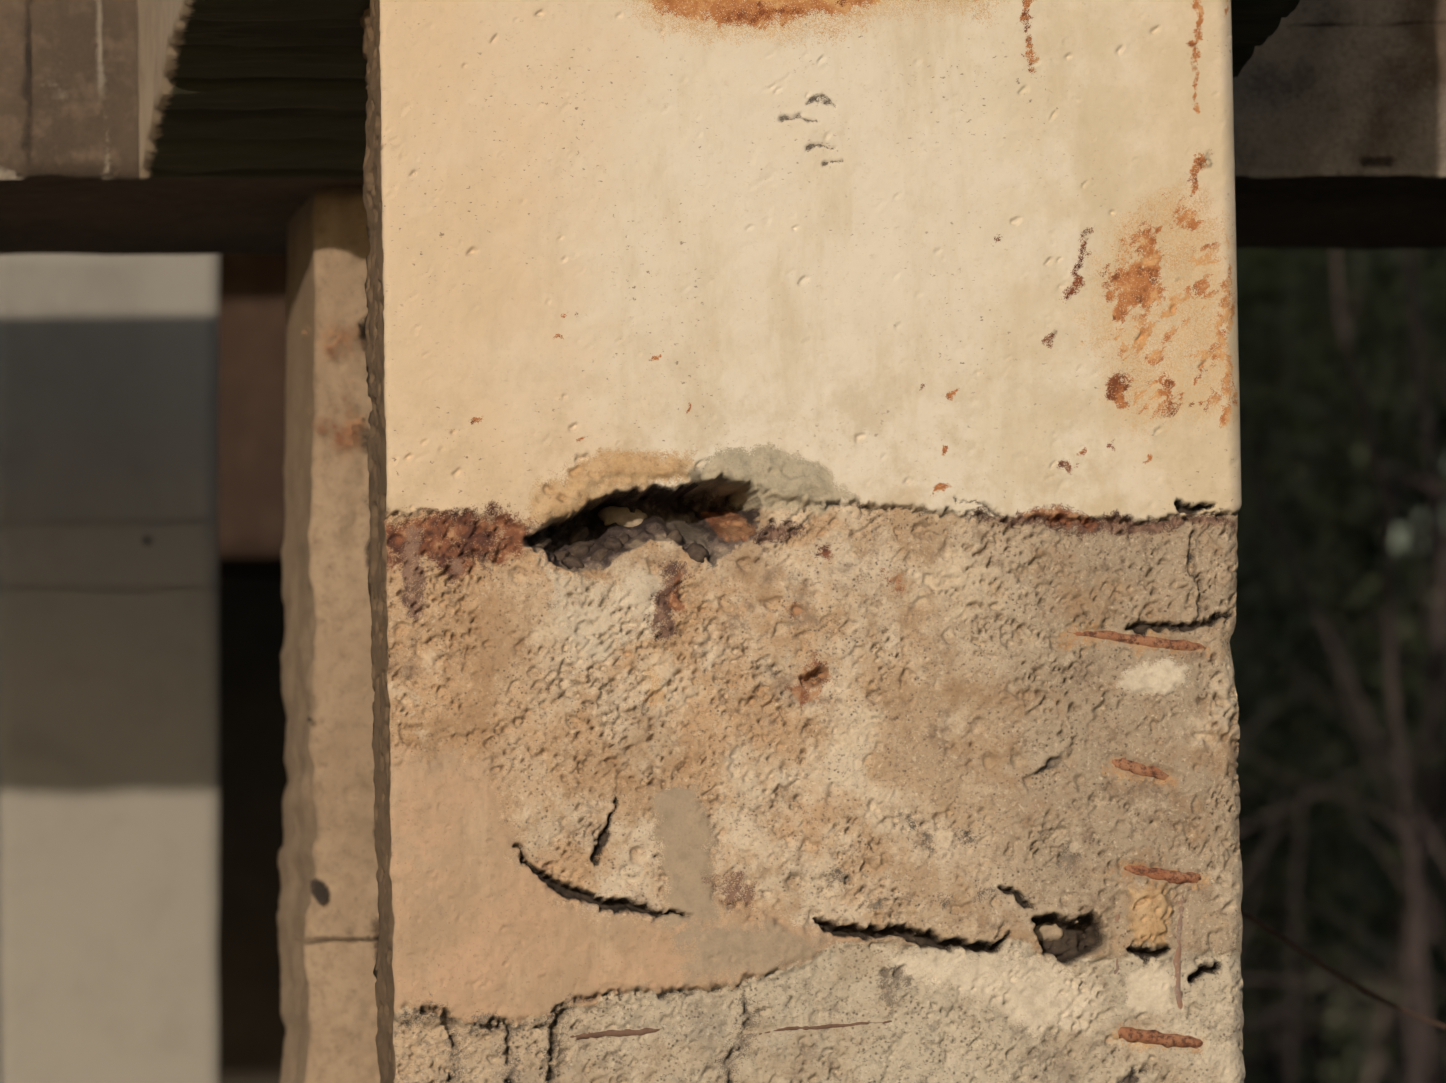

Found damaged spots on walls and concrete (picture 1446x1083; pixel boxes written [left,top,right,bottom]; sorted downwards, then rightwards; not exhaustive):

corrosion [620,0,1039,73]
corrosion [1186,0,1204,114]
crack [779,94,843,166]
corrosion [1041,149,1239,463]
corrosion [384,499,547,622]
crack [819,498,1004,520]
corrosion [1057,447,1087,474]
crack [1124,500,1234,635]
spalling [385,479,1245,1083]
crack [513,797,690,918]
crack [814,885,1036,953]
crack [397,971,774,1083]